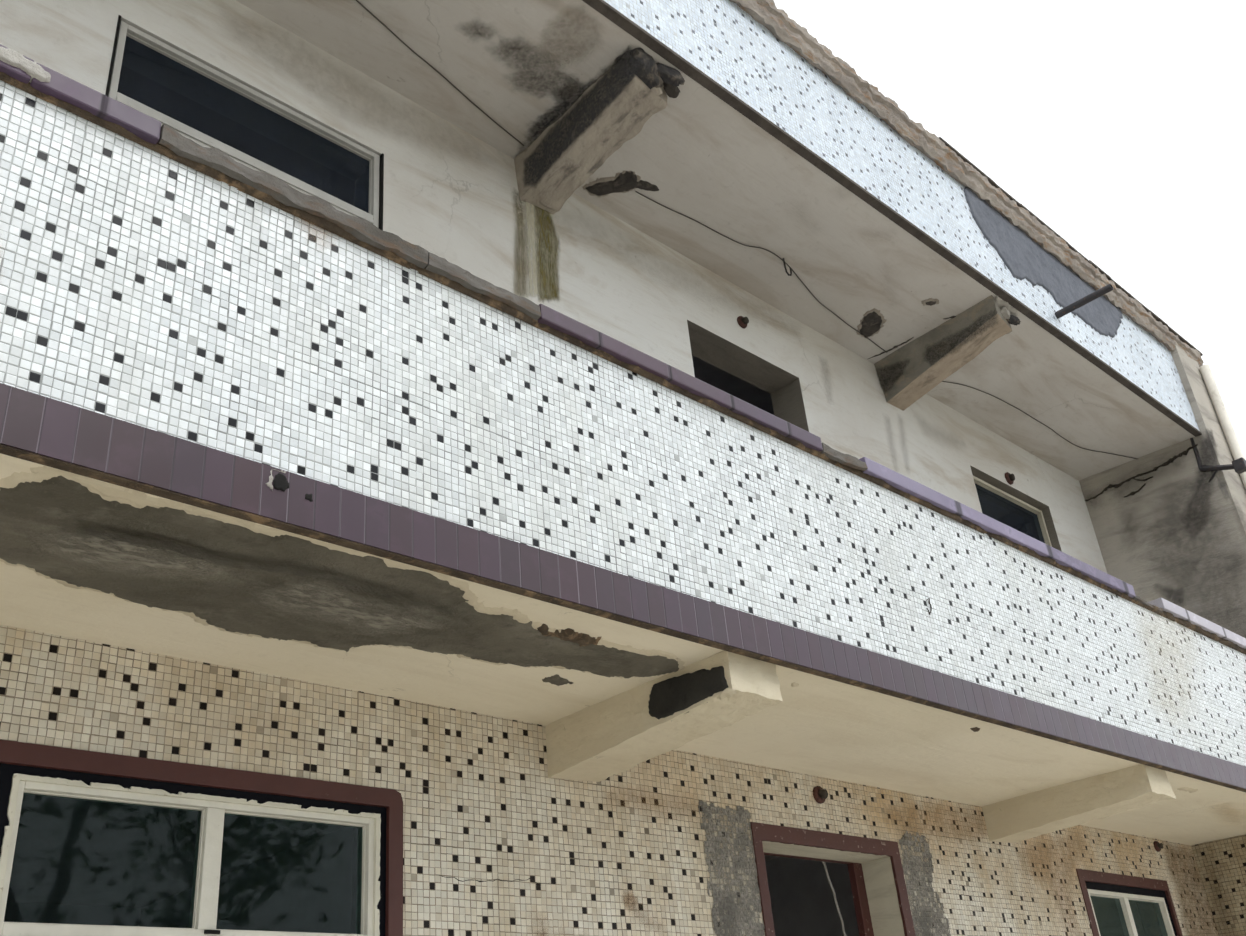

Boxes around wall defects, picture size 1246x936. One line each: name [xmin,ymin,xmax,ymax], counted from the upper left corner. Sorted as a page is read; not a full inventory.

spalling [614,47,685,98]
leakage [501,43,641,186]
spalling [582,170,659,197]
leakage [527,203,559,300]
spalling [856,308,887,338]
spalling [995,295,1021,334]
crack [1085,444,1198,501]
peeling [0,466,685,675]
spalling [528,666,591,686]
spalling [717,688,736,699]